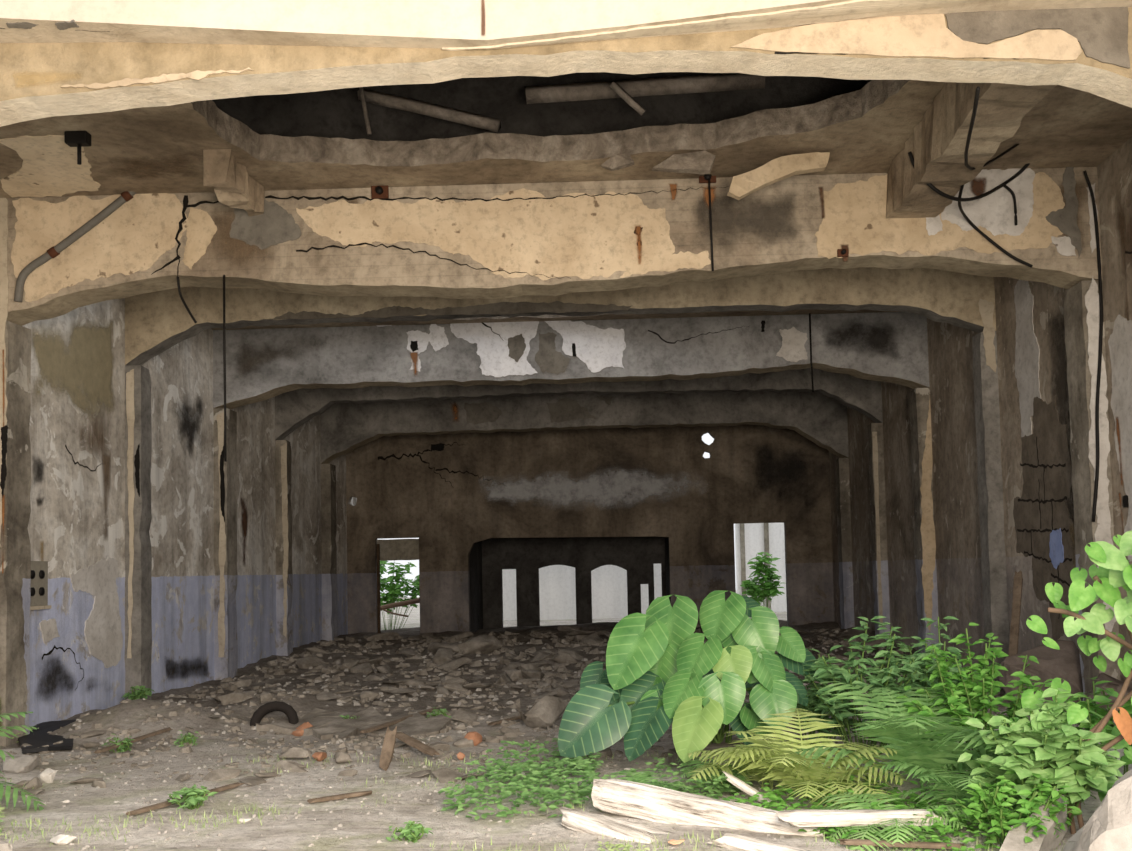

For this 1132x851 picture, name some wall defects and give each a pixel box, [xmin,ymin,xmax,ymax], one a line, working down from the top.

peeling [442,0,1130,69]
crack [265,186,729,202]
spalling [727,152,830,200]
peeling [815,167,1098,259]
crack [296,242,569,279]
water stain [828,322,896,354]
peeling [1085,278,1132,545]
spalling [1013,280,1076,640]
peeling [126,369,140,658]
peeling [216,412,226,657]